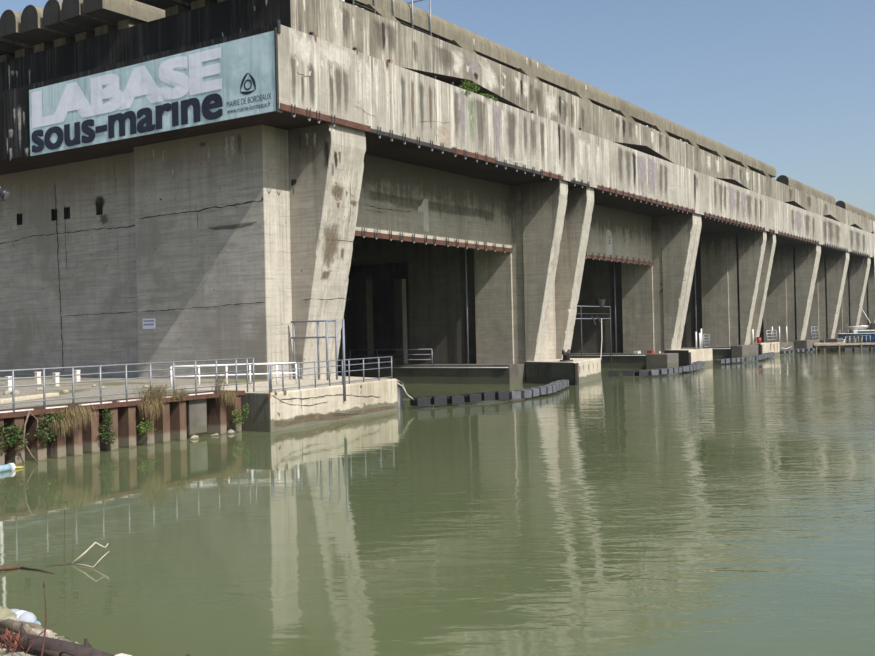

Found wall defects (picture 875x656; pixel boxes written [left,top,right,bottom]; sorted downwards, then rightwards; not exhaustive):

damp [375,22,394,47]
damp [291,57,314,102]
damp [330,69,348,108]
damp [359,62,432,123]
damp [515,79,540,107]
damp [299,133,341,175]
damp [455,92,544,156]
damp [558,97,601,175]
damp [619,149,667,192]
damp [714,182,762,218]
damp [791,197,839,242]
crack [0,188,263,371]